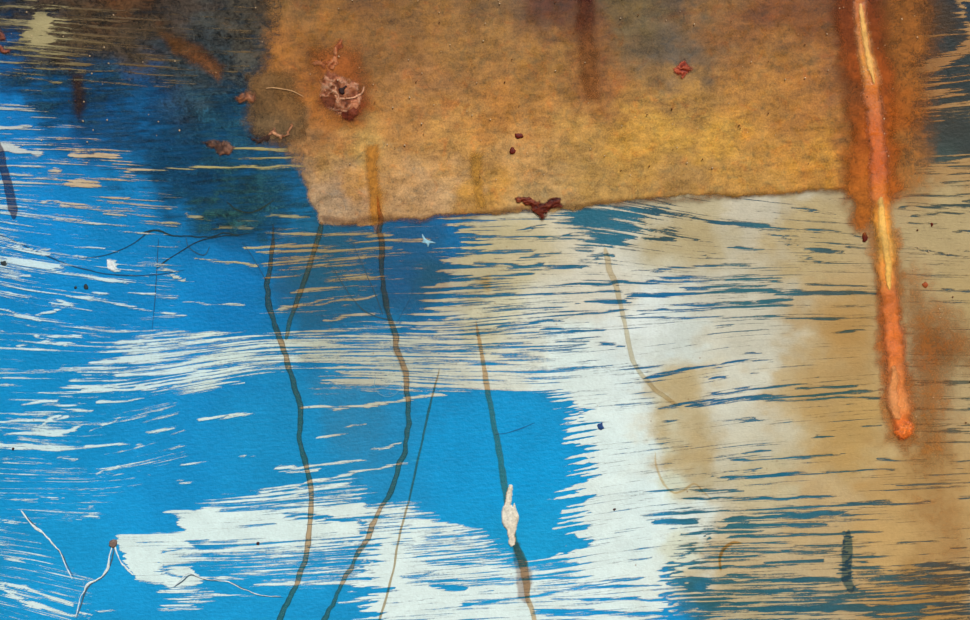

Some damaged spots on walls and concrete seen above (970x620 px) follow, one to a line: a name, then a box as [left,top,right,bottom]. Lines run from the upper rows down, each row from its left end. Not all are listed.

corrosion [235,0,970,454]